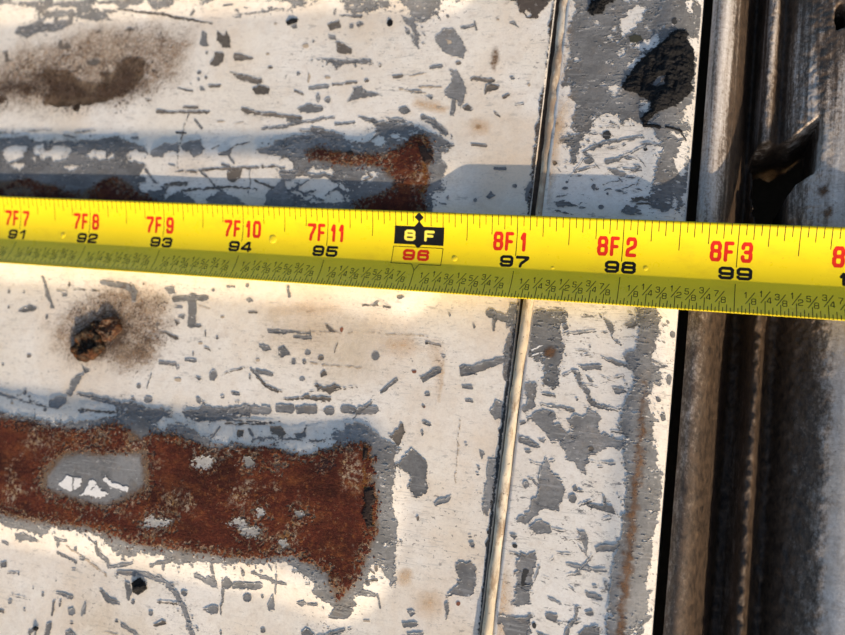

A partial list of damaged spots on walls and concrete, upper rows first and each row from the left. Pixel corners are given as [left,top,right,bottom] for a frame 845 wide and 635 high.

peeling [510,0,552,19]
peeling [0,9,410,207]
peeling [393,21,510,116]
peeling [549,0,702,215]
corrosion [0,175,157,202]
corrosion [269,120,453,212]
peeling [180,345,379,447]
peeling [460,303,517,403]
corrosion [0,396,408,613]
peeling [394,449,428,498]
peeling [517,307,675,635]
peeling [194,563,287,615]